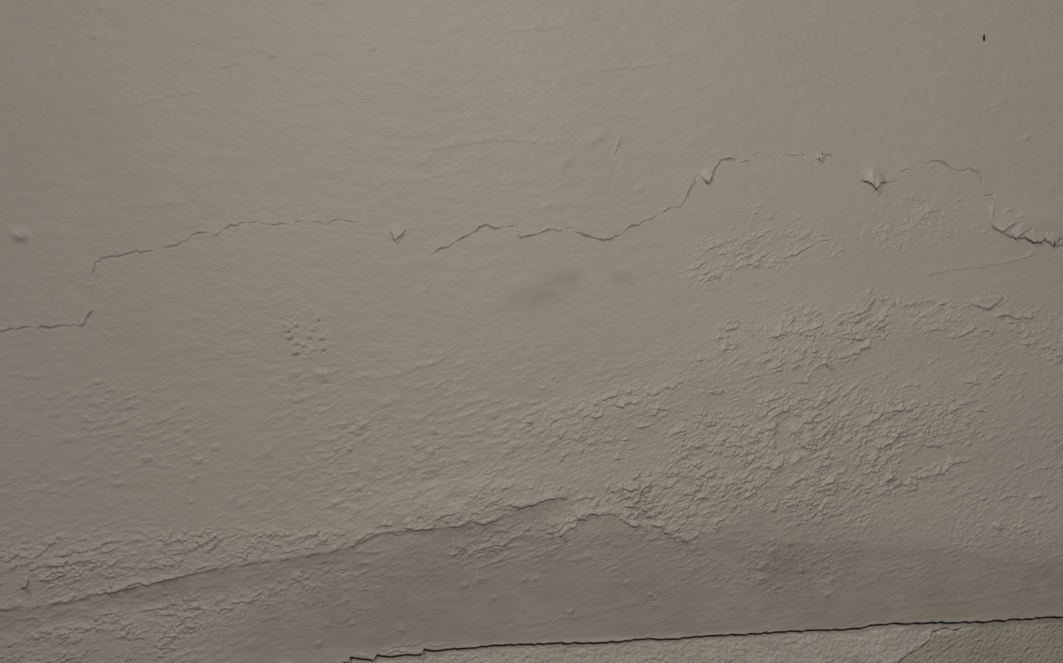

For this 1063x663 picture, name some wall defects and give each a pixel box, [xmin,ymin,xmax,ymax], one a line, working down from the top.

crack [427,150,851,262]
crack [884,158,998,222]
crack [0,217,378,336]
peeling [0,460,743,610]
flaking render [314,613,1063,663]